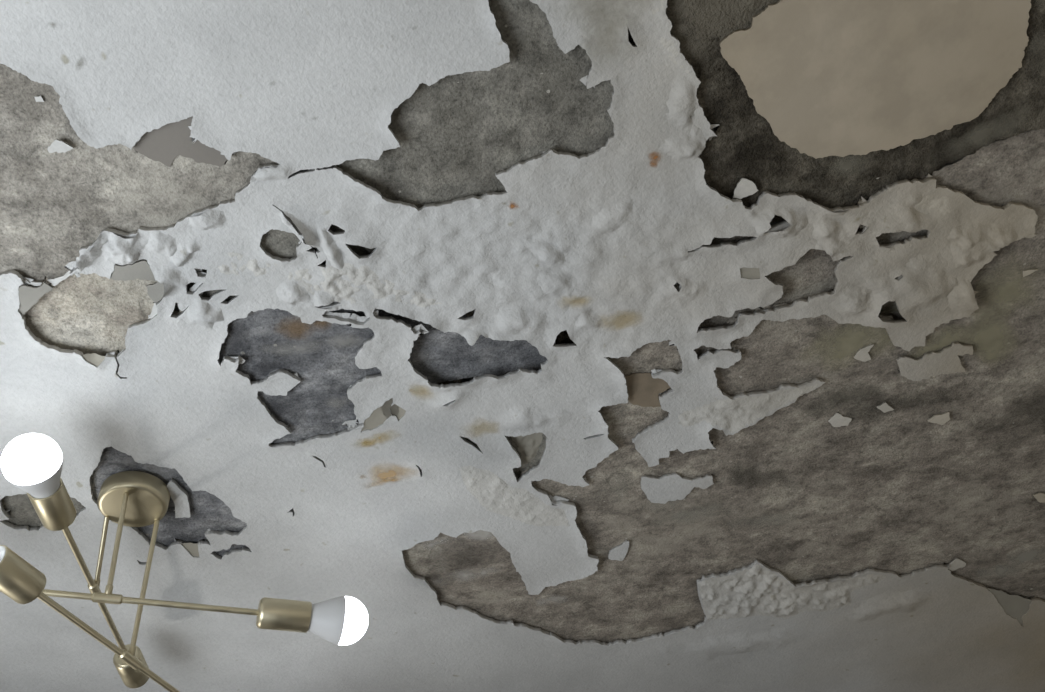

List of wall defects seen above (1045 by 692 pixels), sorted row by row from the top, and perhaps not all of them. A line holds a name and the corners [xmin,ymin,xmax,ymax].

peeling [332,0,614,208]
peeling [0,64,277,372]
peeling [219,263,547,444]
peeling [402,0,1045,643]
peeling [1,494,42,528]
peeling [90,447,247,557]